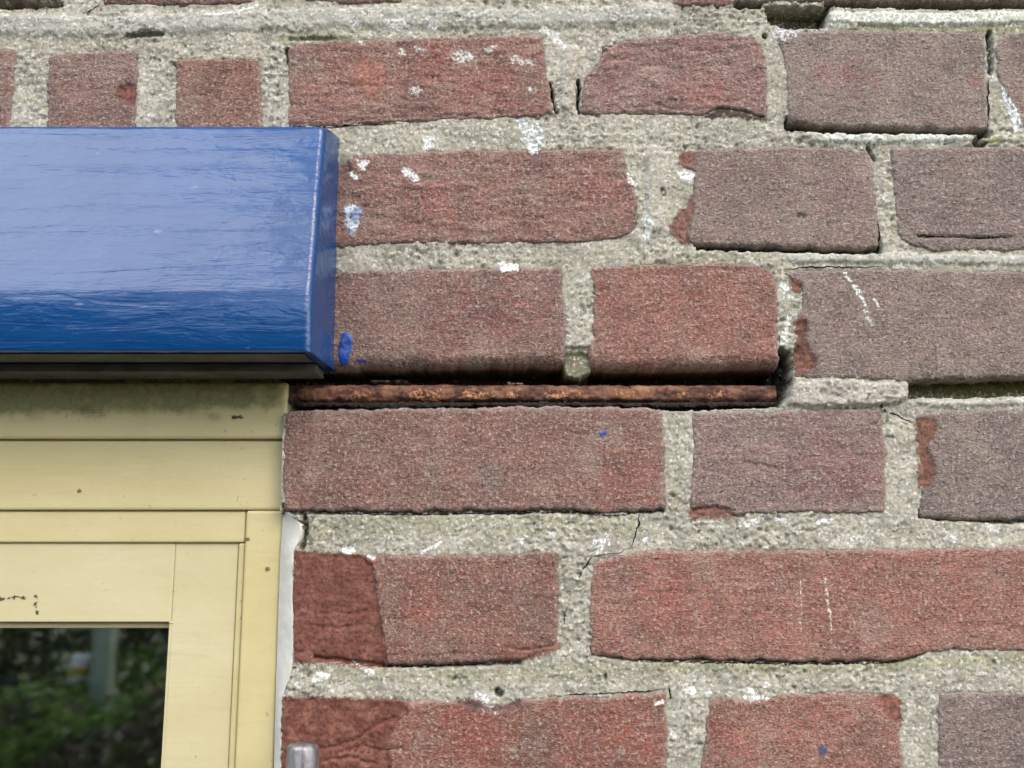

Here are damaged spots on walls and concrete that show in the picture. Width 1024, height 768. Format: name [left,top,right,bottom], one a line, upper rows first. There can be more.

spalling [676,151,696,168]
spalling [669,193,695,245]
crack [917,232,1008,240]
rust [391,362,759,403]
spalling [913,418,940,489]
crack [303,511,661,577]